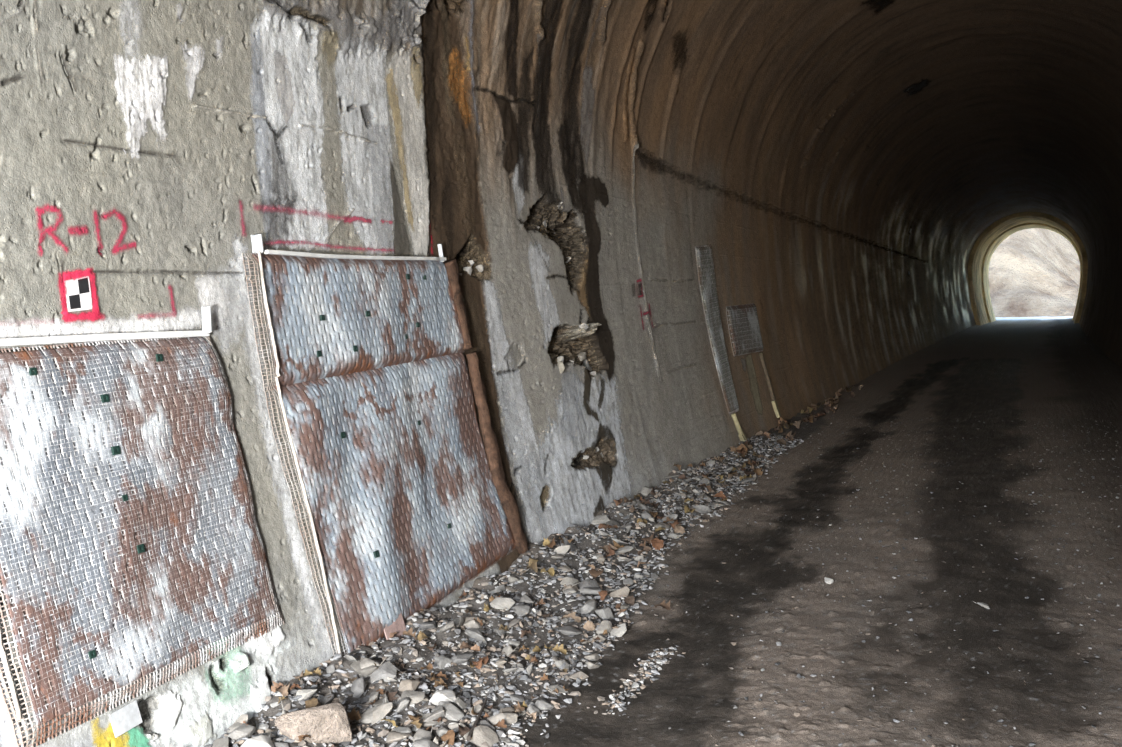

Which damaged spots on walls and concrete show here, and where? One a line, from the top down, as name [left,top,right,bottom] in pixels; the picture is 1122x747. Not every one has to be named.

crack [269,0,310,42]
rust [449,35,471,125]
crack [476,87,535,105]